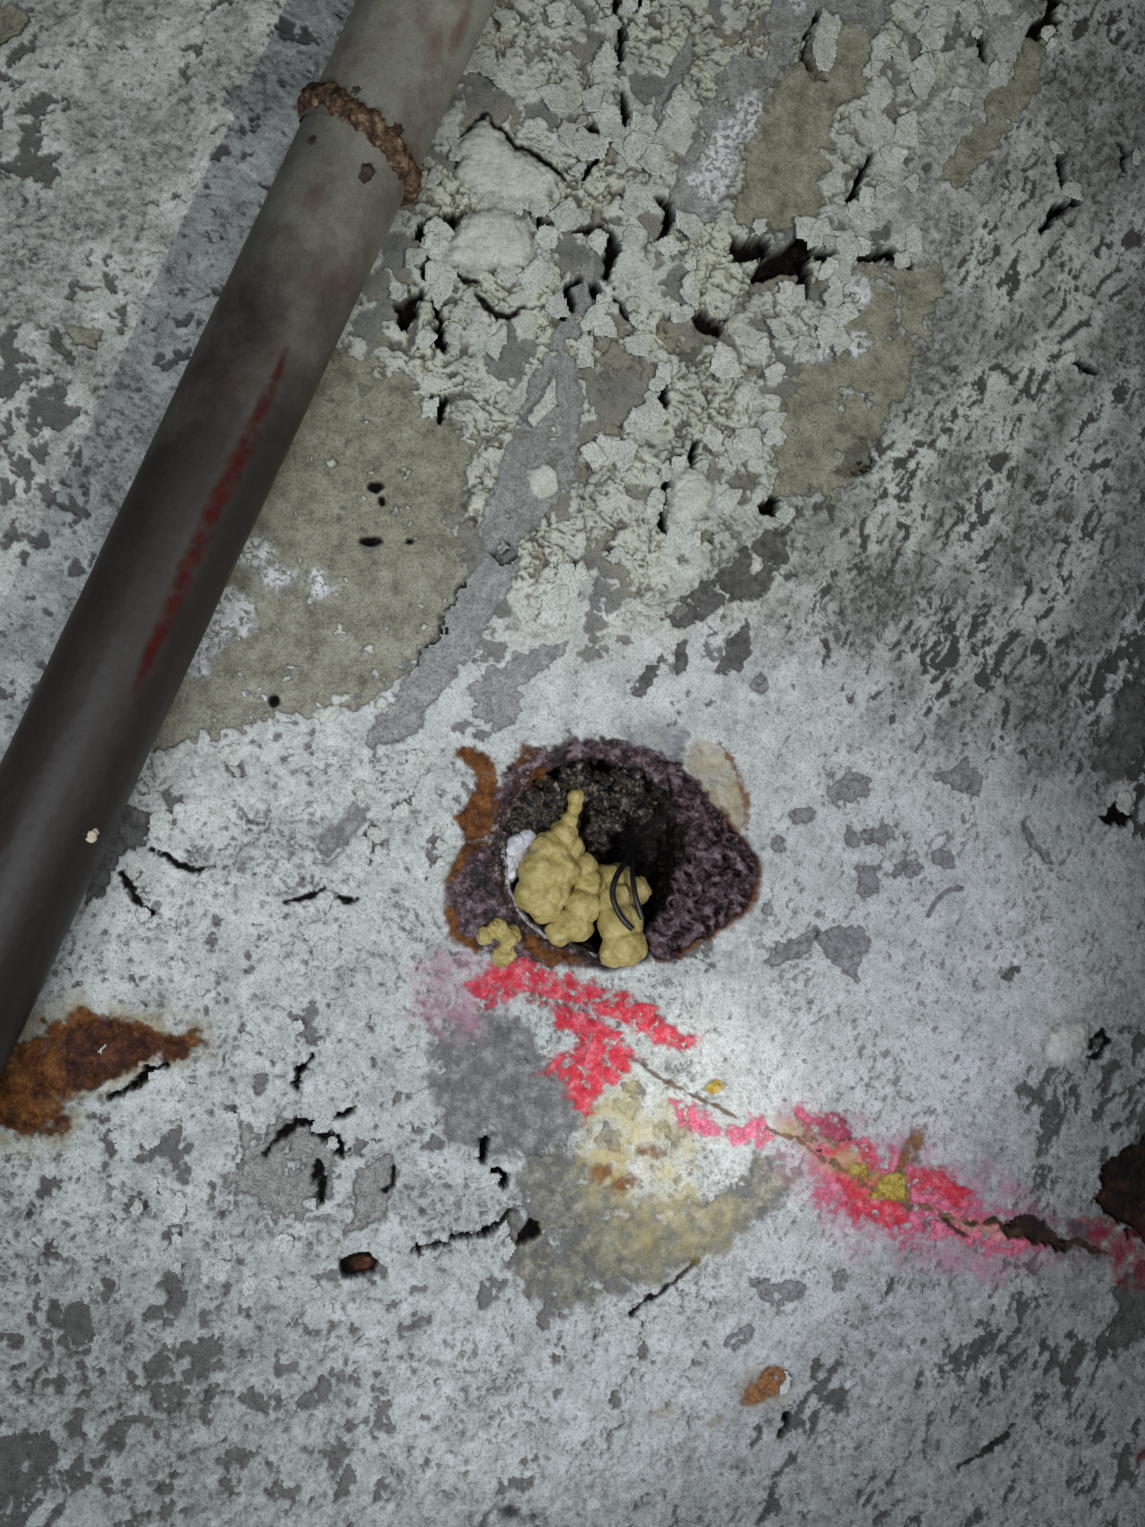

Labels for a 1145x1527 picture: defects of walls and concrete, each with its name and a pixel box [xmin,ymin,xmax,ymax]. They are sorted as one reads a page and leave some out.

peeling [1038,140,1084,233]
flaking render [152,0,1058,867]
flaking render [85,776,174,904]
rust [444,743,604,969]
spalling [529,757,772,960]
peeling [845,825,955,898]
rust [0,1002,204,1140]
peeling [240,994,348,1087]
peeling [109,1129,162,1151]
crack [627,1053,1108,1255]
peeling [130,1178,186,1274]
rust [741,1367,793,1405]